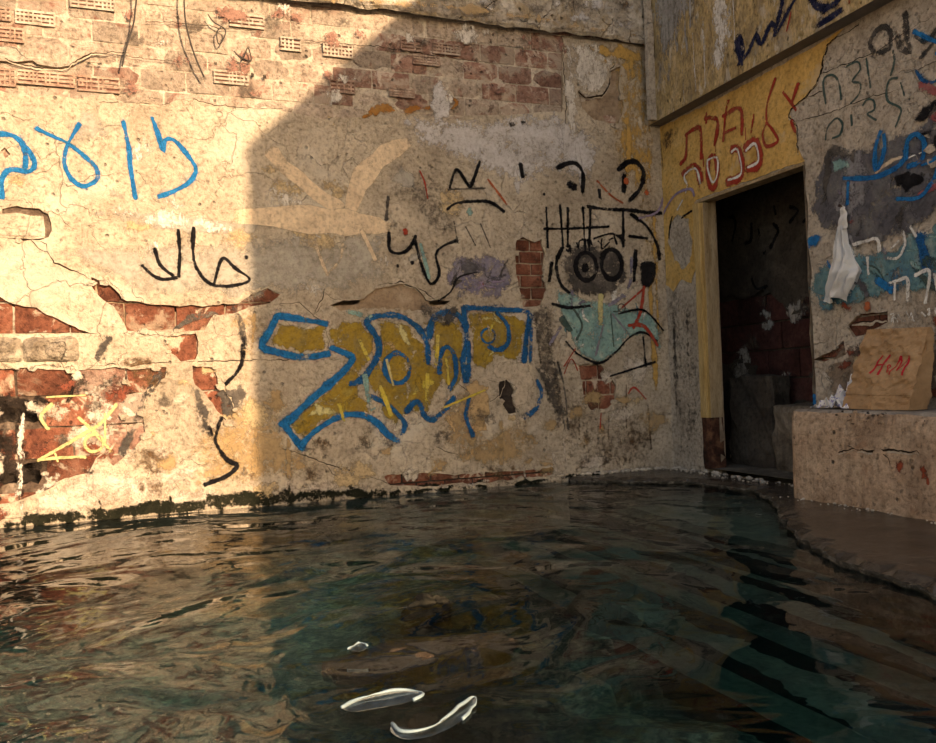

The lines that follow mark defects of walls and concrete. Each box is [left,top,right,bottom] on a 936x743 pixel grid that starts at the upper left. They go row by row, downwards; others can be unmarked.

crack [99,97,169,106]
crack [193,98,282,110]
flaking render [0,207,52,244]
crack [31,240,93,281]
flaking render [512,238,548,307]
flaking render [0,297,86,335]
crack [91,282,344,366]
flaking render [86,277,280,427]
flaking render [0,364,166,504]
leakage [0,358,376,520]
leakage [401,460,447,488]
crack [838,446,919,464]